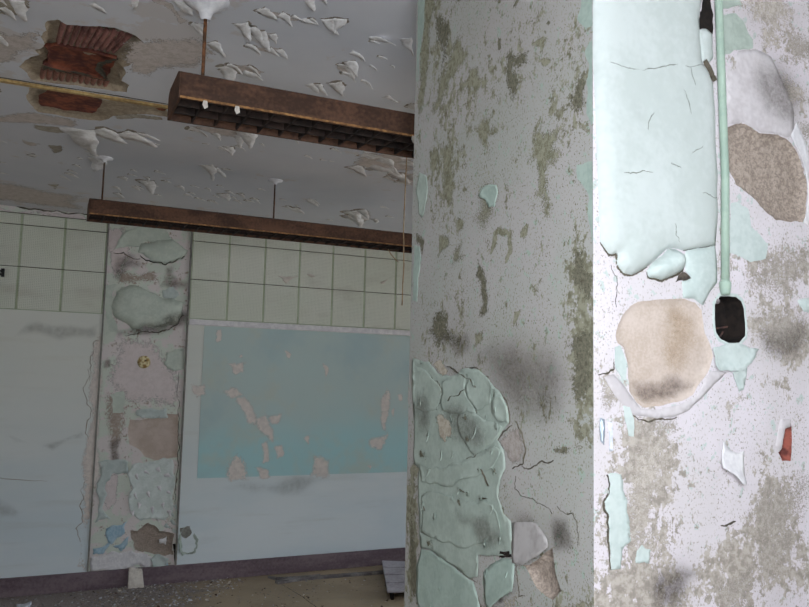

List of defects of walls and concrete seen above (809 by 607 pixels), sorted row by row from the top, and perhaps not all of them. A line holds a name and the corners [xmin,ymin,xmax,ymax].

flaking render [0,0,263,81]
spalling [38,90,102,113]
peeling [34,125,160,155]
peeling [184,126,258,156]
peeling [527,98,562,219]
peeling [428,310,461,346]
peeling [566,0,809,564]
peeling [78,271,198,571]
peeling [223,387,284,482]
peeling [368,358,561,607]
crack [431,366,579,540]